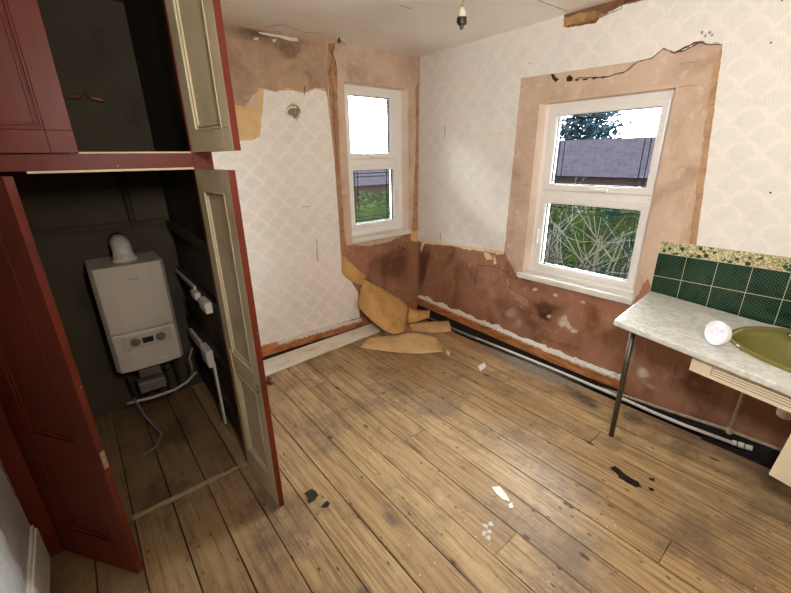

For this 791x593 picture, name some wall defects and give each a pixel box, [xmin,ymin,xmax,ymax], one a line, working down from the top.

peeling [253,32,298,43]
spalling [564,0,642,28]
spalling [327,37,350,257]
spalling [409,84,425,251]
spalling [689,47,722,245]
spalling [417,295,621,381]
leakage [538,304,578,333]